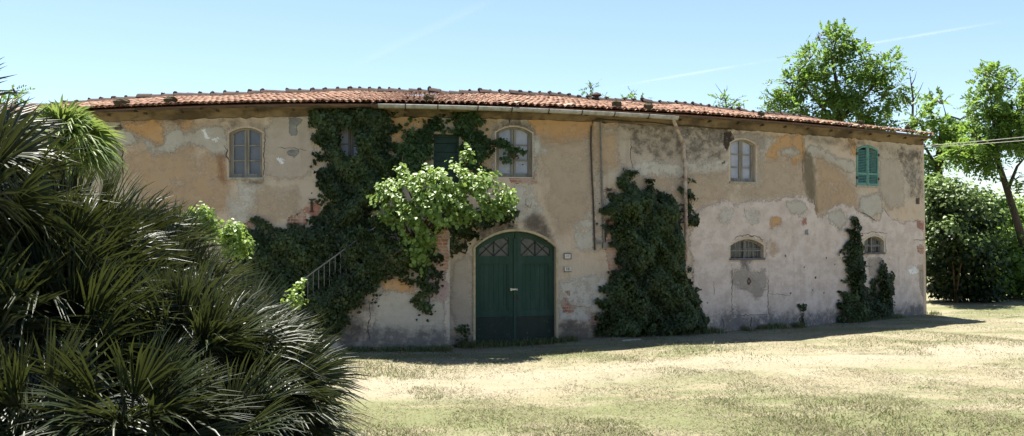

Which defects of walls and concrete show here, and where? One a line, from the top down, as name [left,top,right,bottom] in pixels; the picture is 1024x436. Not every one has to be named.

peeling [99,116,321,230]
flaking render [459,118,924,331]
flaking render [372,229,473,346]